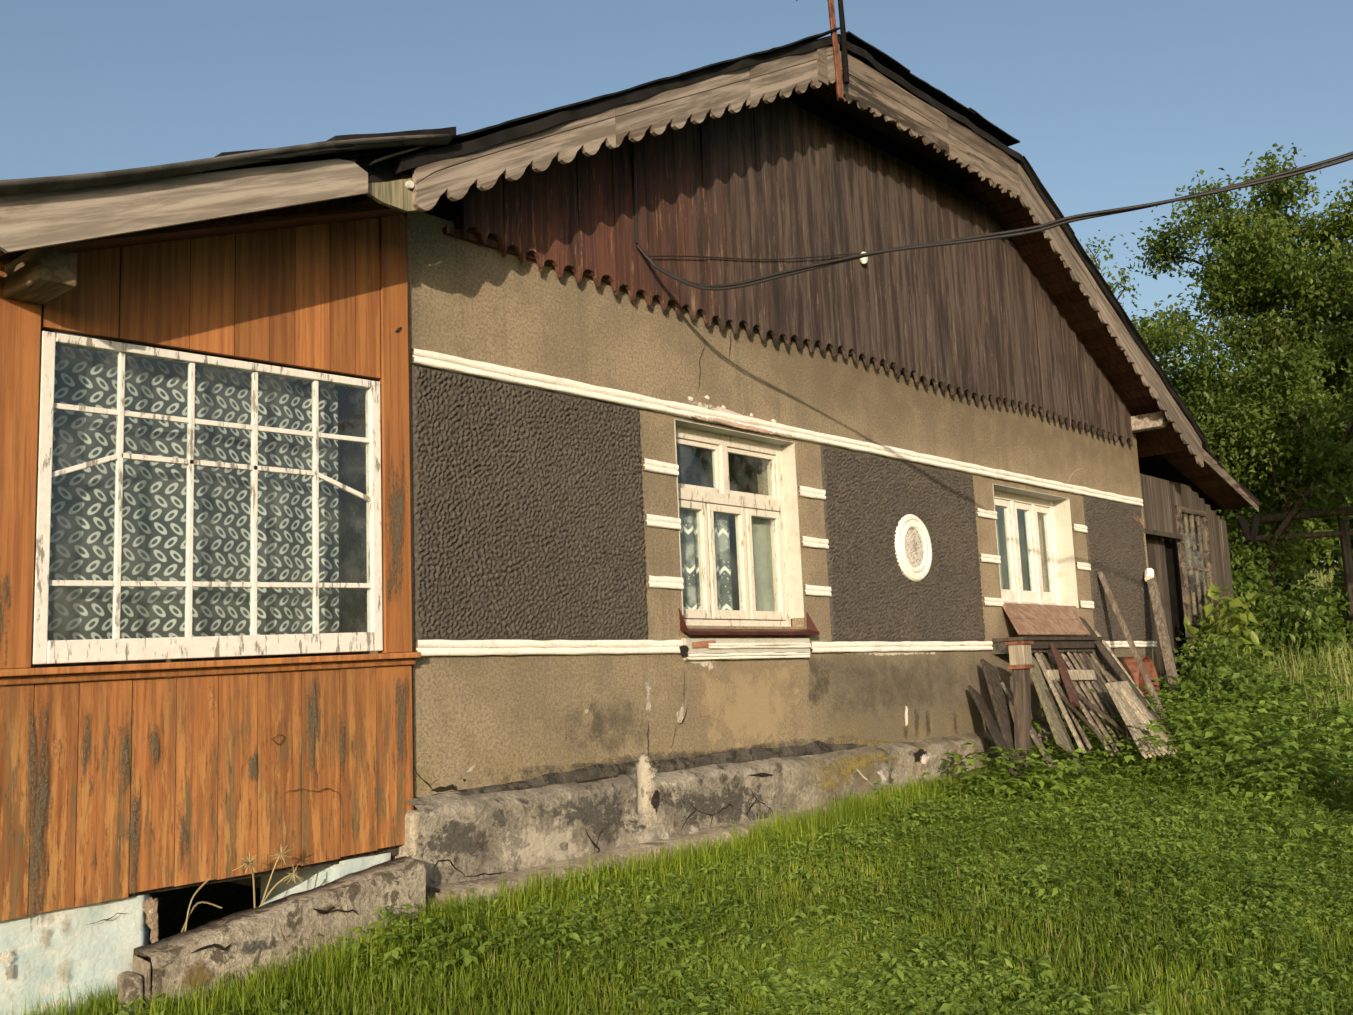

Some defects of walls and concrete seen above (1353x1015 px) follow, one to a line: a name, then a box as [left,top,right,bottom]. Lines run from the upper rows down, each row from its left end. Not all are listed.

water stain [524,680,805,774]
crack [681,786,773,830]
crack [313,906,358,915]
crack [191,942,234,953]
spalling [0,950,14,980]